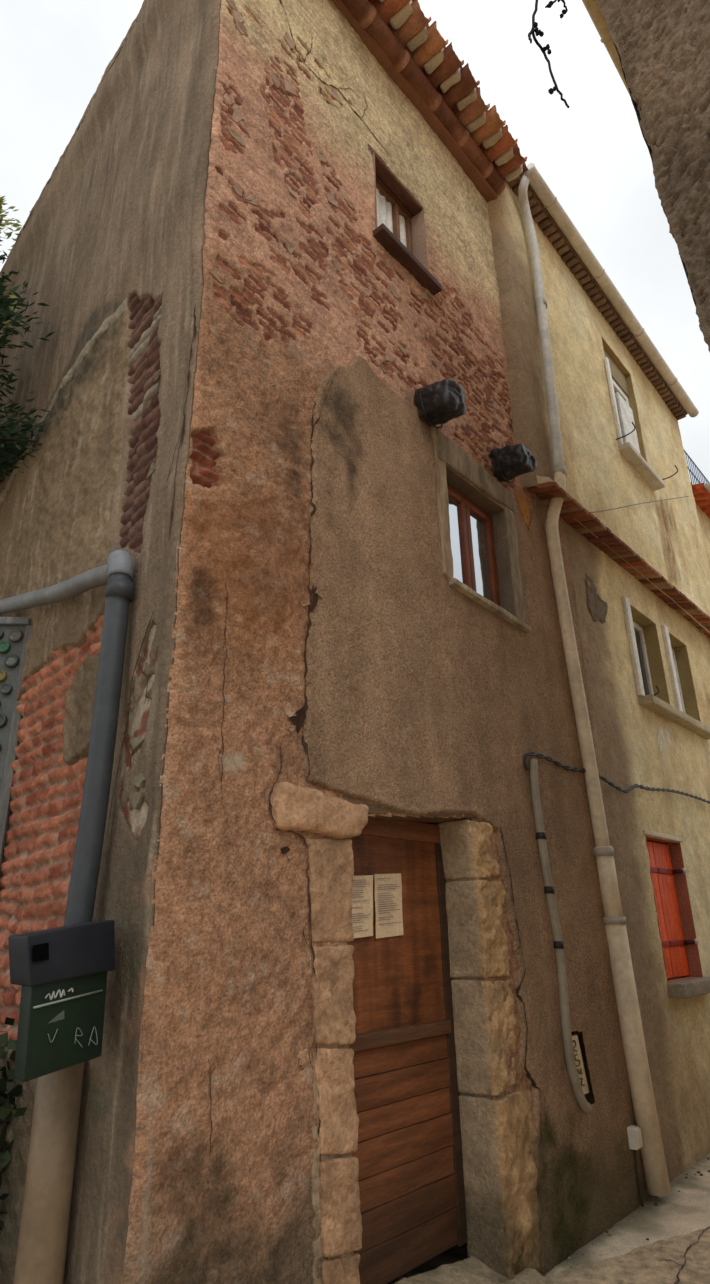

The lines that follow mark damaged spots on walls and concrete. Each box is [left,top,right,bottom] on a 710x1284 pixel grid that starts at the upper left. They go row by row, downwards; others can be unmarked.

crack [280,0,391,158]
flaking render [208,32,530,531]
flaking render [119,292,163,553]
flaking render [190,432,220,488]
crack [269,370,337,980]
crack [500,828,541,1093]